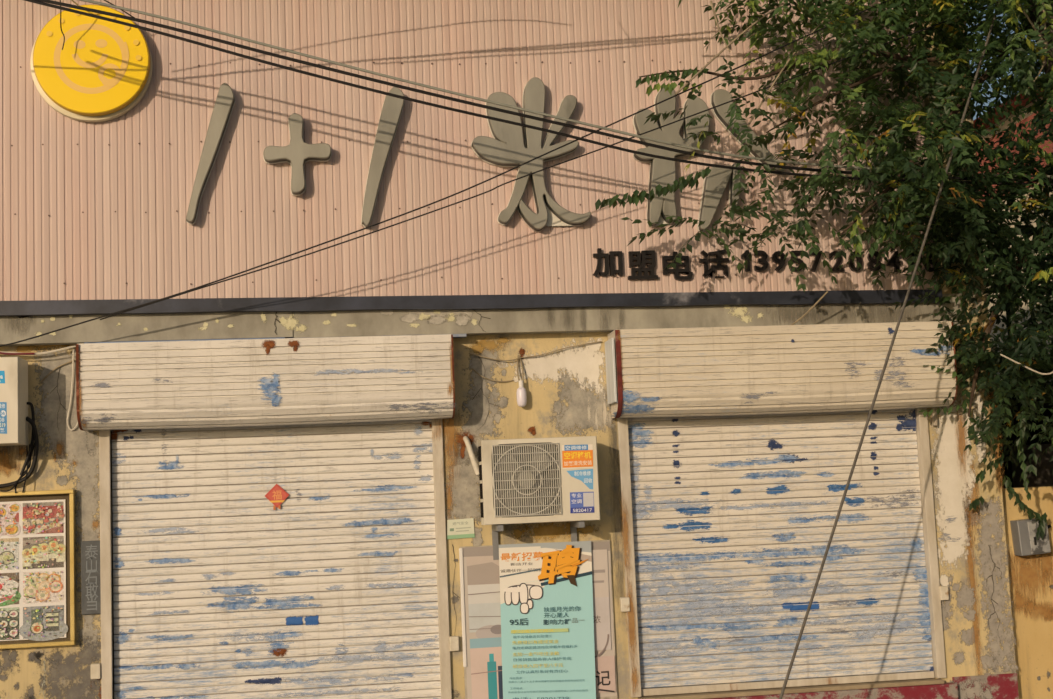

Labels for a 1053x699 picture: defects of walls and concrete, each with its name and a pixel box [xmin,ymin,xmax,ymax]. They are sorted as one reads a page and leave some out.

corrosion [262,340,275,355]
peeling [257,372,283,407]
peeling [155,430,184,470]
peeling [27,320,115,699]
peeling [132,493,190,502]
peeling [339,517,418,557]
peeling [353,338,1019,699]
crack [986,545,1002,643]
damp [1027,602,1053,620]
peeling [202,572,439,697]
peeling [114,663,201,671]
peeling [116,686,209,699]